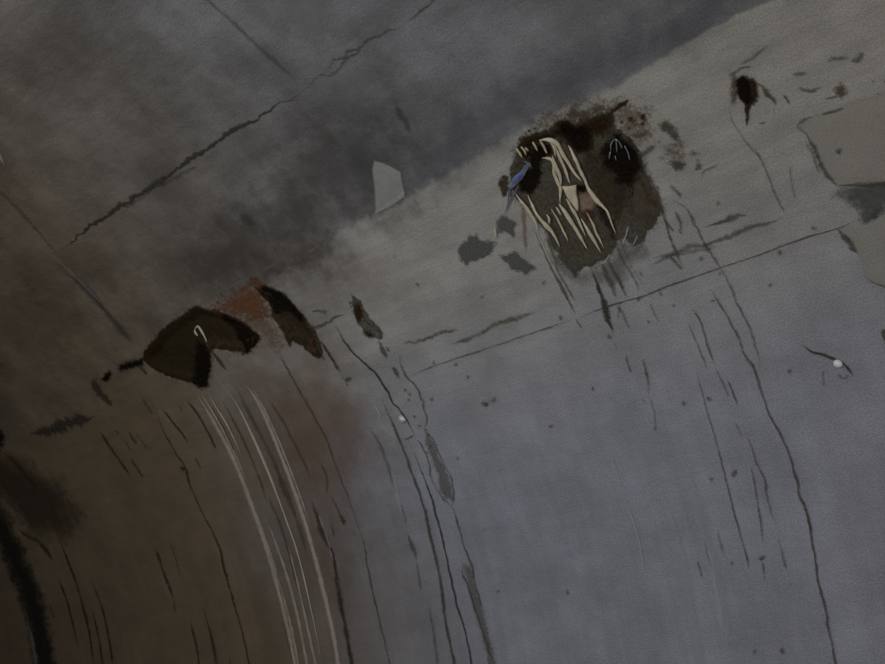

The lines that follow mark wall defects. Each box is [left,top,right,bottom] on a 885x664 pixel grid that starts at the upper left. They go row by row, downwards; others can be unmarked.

crack [333,0,433,64]
crack [64,75,319,247]
spalling [498,113,663,278]
spalling [730,75,789,126]
peeling [801,95,885,187]
spalling [143,306,260,390]
spalling [256,285,323,359]
spalling [349,295,388,356]
crack [451,222,852,361]
crack [800,344,852,374]
leakage [187,385,353,664]
crack [337,329,472,664]